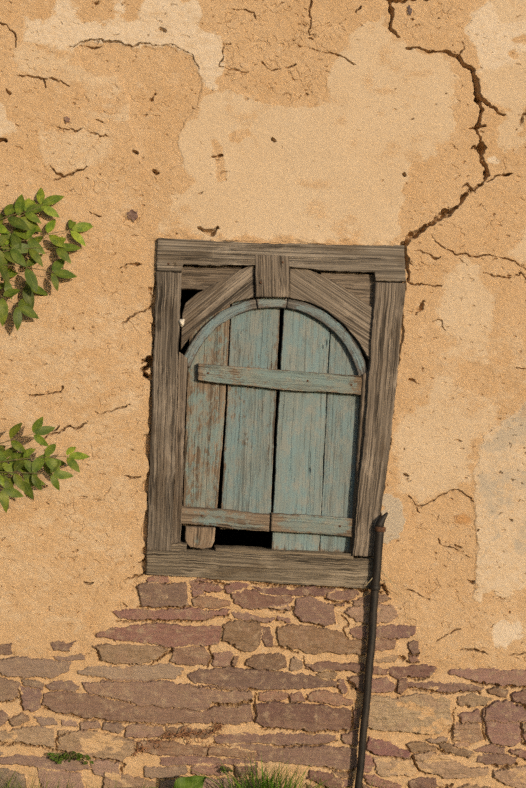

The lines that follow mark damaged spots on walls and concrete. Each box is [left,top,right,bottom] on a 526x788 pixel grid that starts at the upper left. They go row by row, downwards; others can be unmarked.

crack [0,21,17,48]
crack [69,38,241,71]
crack [229,8,257,25]
crack [261,0,357,71]
crack [16,74,71,88]
peeling [13,0,526,245]
crack [386,0,526,291]
crack [397,314,405,365]
crack [44,261,157,580]
peeling [394,257,502,598]
crack [408,488,474,513]